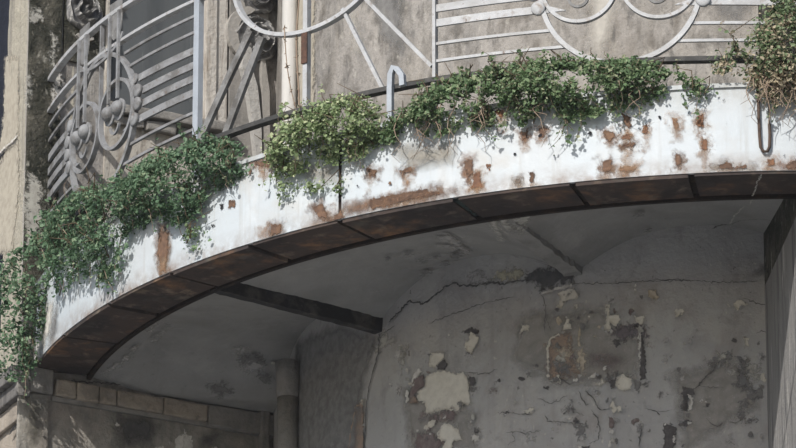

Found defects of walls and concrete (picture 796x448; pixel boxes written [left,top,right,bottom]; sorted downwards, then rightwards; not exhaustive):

rust [310,167,456,221]
rust [463,157,491,193]
rust [600,114,650,177]
rust [155,223,171,272]
crack [572,279,765,305]
peeling [461,327,479,354]
leakage [516,309,639,384]
spalling [517,283,650,448]
peeling [388,352,480,448]
leakage [404,394,474,448]
spalling [663,367,710,448]
leakage [676,365,755,447]